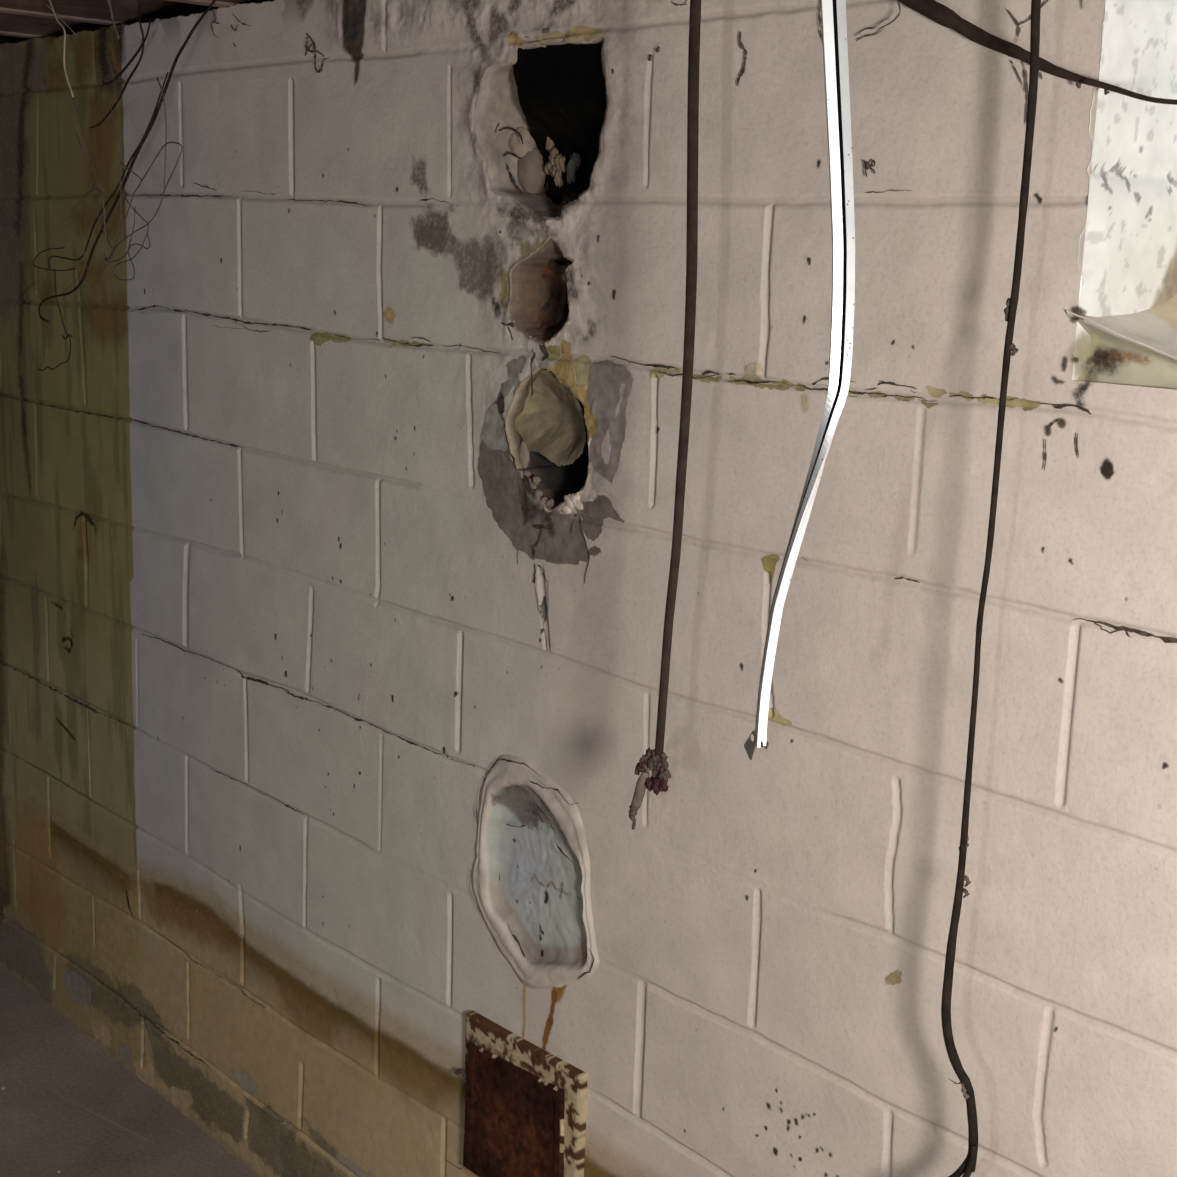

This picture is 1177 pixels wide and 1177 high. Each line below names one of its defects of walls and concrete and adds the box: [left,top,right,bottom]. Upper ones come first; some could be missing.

spalling [474,26,609,221]
water stain [0,42,45,455]
spalling [478,236,633,565]
crack [612,356,1091,414]
crack [0,662,134,728]
crack [143,634,475,767]
crack [1074,618,1177,643]
water stain [0,576,50,1000]
water stain [51,822,479,1177]
corrosion [542,985,565,1051]
water stain [886,971,901,985]
water stain [584,1160,612,1177]